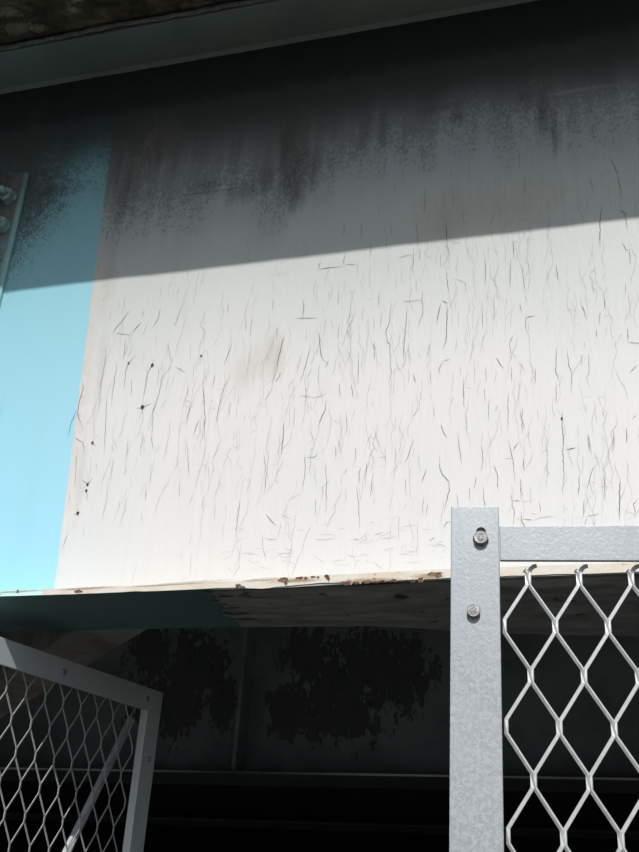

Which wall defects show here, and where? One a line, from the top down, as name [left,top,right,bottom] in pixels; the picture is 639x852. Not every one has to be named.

crack [63,129,639,577]